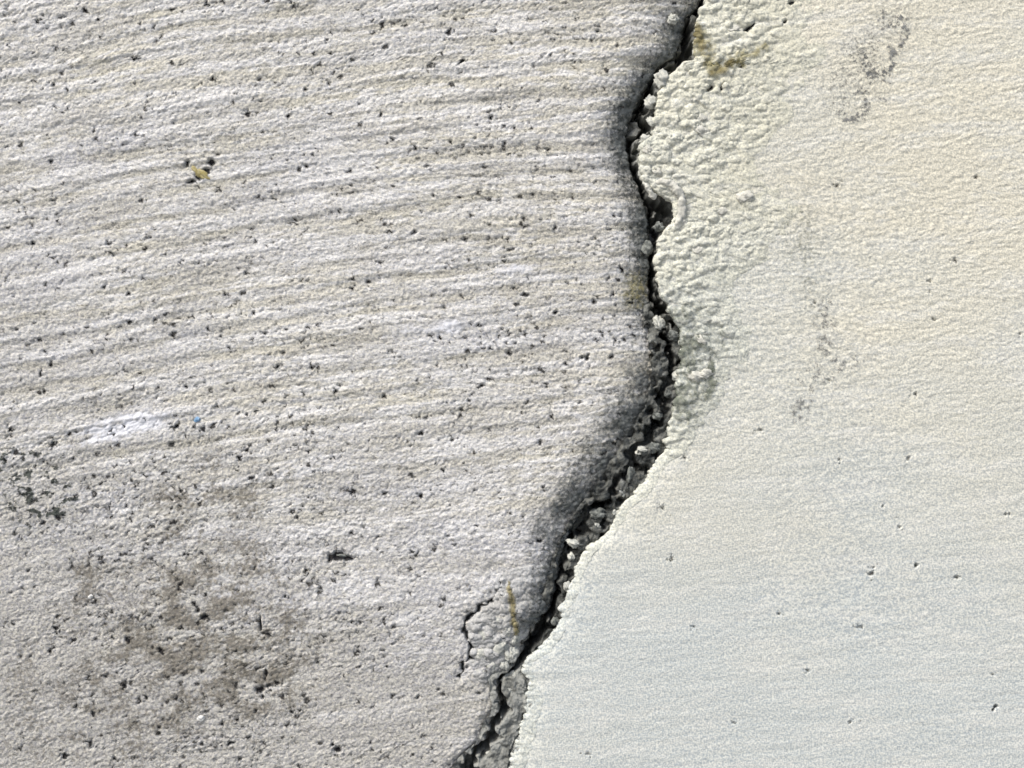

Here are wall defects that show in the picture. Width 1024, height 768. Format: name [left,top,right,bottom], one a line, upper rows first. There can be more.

crack [452,0,705,768]